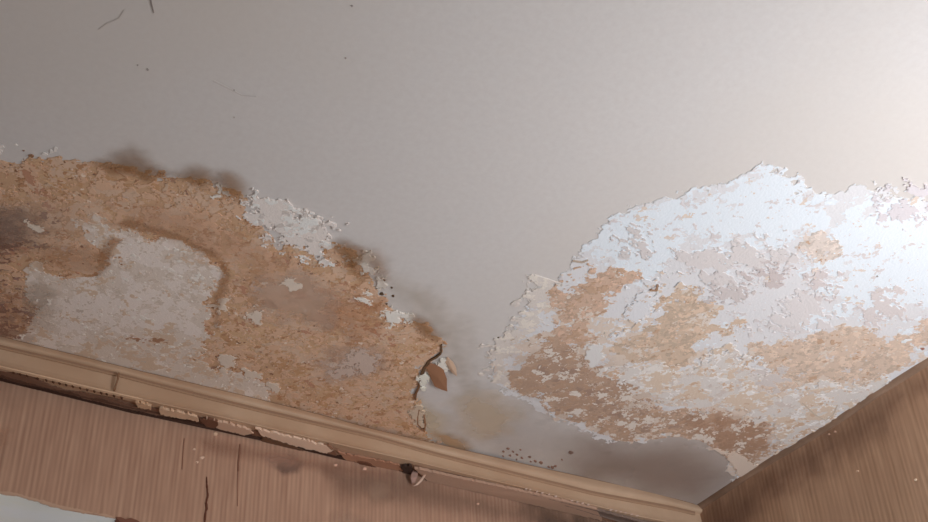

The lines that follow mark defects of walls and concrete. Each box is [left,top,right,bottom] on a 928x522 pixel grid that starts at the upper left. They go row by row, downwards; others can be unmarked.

peeling [0,144,457,444]
peeling [477,161,928,482]
crack [0,372,262,506]
crack [202,477,210,522]
peeling [135,400,333,454]
crack [298,447,347,461]